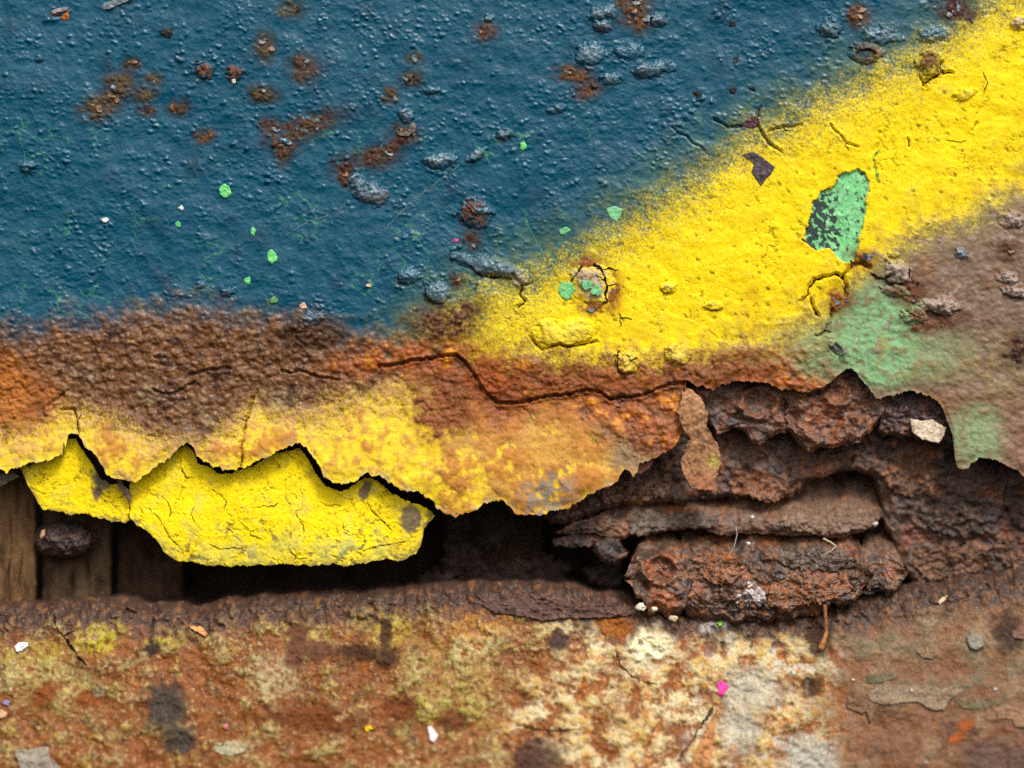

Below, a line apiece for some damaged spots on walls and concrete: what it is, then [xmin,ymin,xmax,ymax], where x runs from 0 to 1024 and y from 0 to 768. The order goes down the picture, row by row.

crack [802,260,869,336]
corrosion [413,356,515,445]
crack [382,355,683,408]
peeling [911,419,946,443]
peeling [635,460,654,474]
corrosion [599,472,719,537]
corrosion [883,451,1024,581]
peeling [552,533,629,566]
corrosion [691,473,877,624]
peeling [482,594,632,621]
corrosion [285,618,396,668]
corrosion [549,628,569,650]